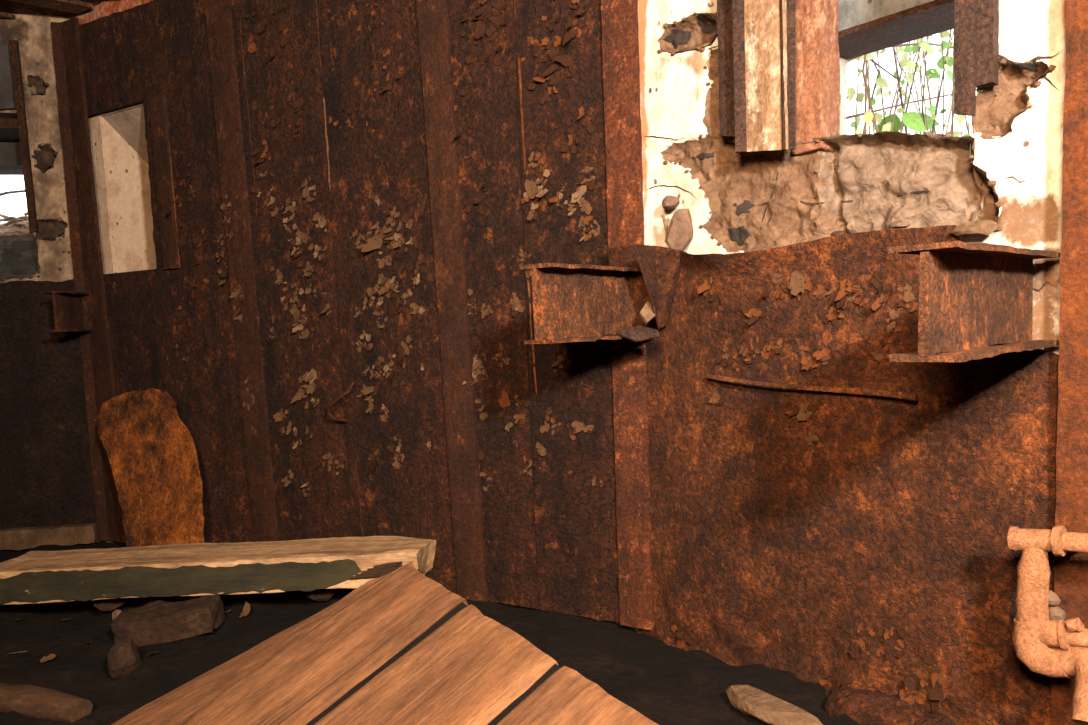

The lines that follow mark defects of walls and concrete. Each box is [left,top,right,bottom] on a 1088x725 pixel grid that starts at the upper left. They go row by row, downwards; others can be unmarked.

corrosion [521,0,590,104]
corrosion [251,81,334,339]
corrosion [521,106,600,242]
spalling [657,0,1056,253]
corrosion [350,184,425,424]
corrosion [715,334,784,372]
corrosion [799,340,831,371]
corrosion [742,270,918,363]
corrosion [273,368,320,457]
corrosion [367,436,405,474]
corrosion [462,353,594,476]
corrosion [898,654,948,715]